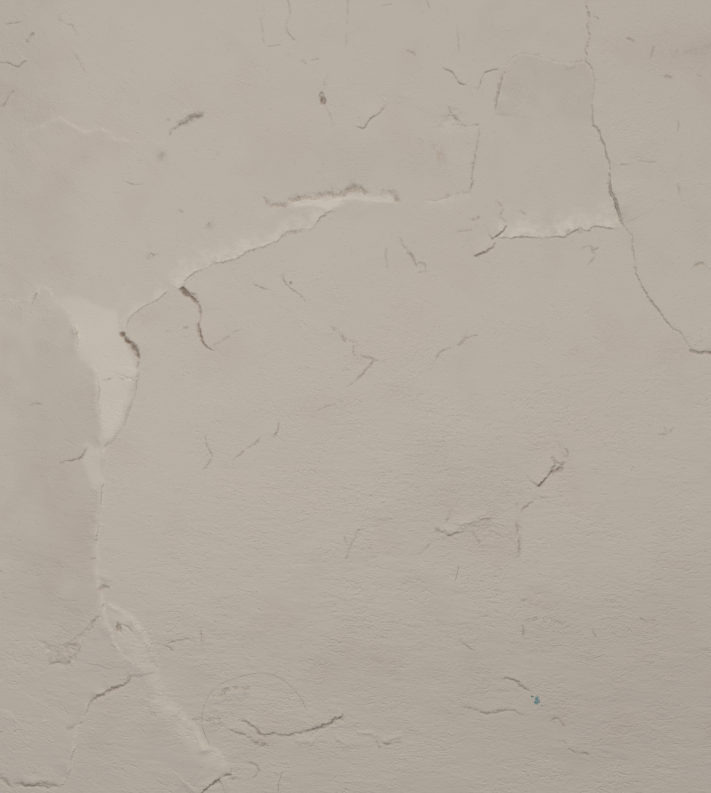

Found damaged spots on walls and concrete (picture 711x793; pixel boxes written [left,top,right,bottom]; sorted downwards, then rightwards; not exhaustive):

crack [583,0,711,358]
crack [457,199,527,259]
crack [178,282,243,355]
crack [237,706,346,749]
crack [197,771,232,793]